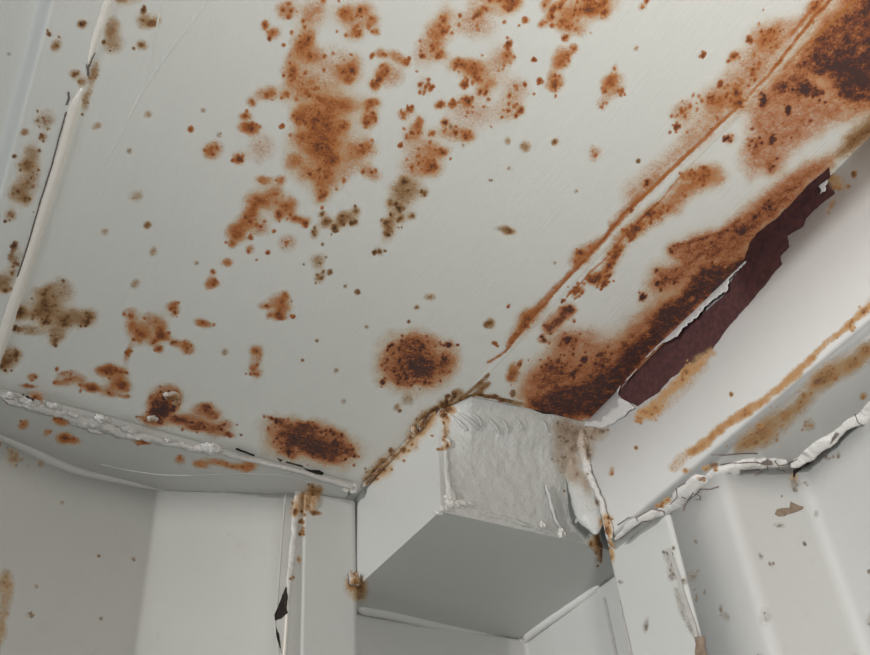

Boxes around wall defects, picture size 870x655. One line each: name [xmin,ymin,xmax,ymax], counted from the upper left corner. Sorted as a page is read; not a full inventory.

crack [86,52,96,76]
corrosion [203,133,222,159]
crack [17,92,70,277]
corrosion [225,0,870,485]
corrosion [12,279,96,348]
peeling [584,167,835,428]
corrosion [0,348,21,372]
corrosion [53,301,193,398]
corrosion [135,385,242,438]
corrosion [292,483,322,536]
crack [612,453,811,543]
peeling [695,636,707,655]